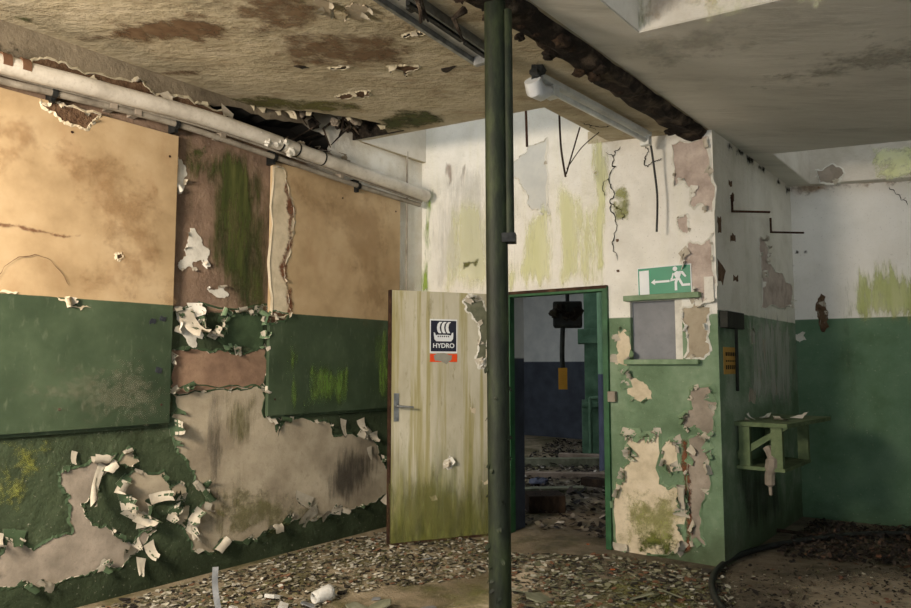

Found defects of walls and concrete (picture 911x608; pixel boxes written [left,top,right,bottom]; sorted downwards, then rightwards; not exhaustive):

damp [92,13,225,43]
damp [237,0,408,67]
spalling [30,56,350,162]
spalling [334,90,373,100]
spalling [815,163,846,185]
spalling [671,136,738,360]
peeling [0,166,387,595]
peeling [610,327,652,403]
peeling [610,383,718,557]